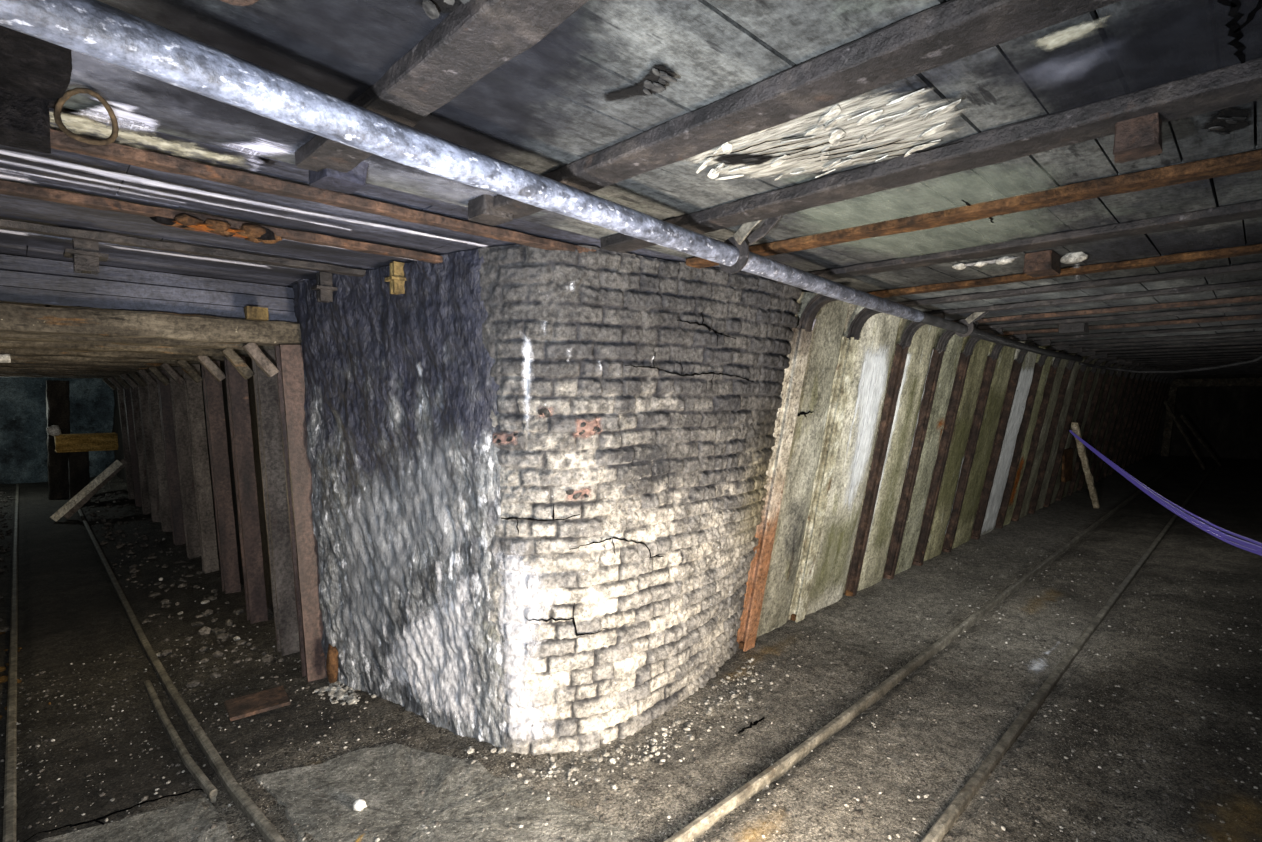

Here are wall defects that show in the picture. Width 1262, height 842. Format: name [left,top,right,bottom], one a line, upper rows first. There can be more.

crack [1217,0,1262,64]
rust [150,214,282,244]